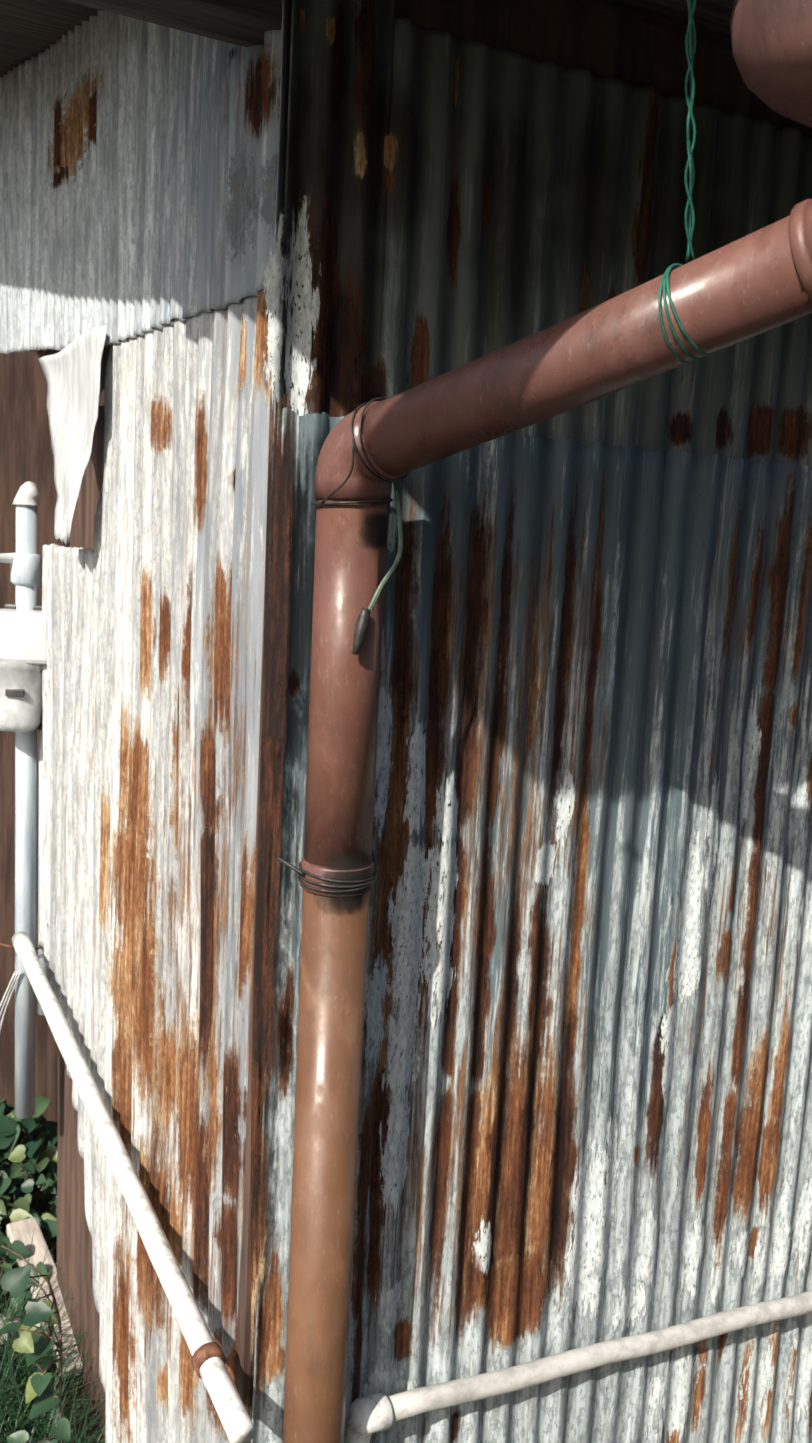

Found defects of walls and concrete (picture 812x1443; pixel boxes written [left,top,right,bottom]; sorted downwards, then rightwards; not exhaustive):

corrosion [48,67,103,195]
corrosion [244,39,281,138]
peeling [224,147,321,416]
corrosion [355,132,367,179]
corrosion [383,134,398,193]
corrosion [99,195,386,1443]
corrosion [351,471,614,1403]
corrosion [634,401,812,1281]